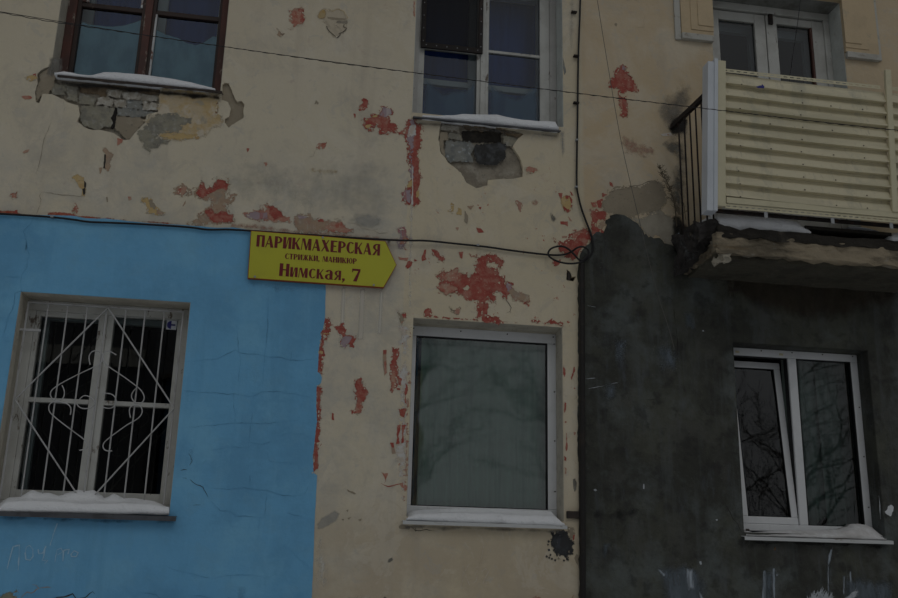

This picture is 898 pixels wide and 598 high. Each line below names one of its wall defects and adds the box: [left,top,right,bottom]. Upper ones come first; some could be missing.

peeling [276,7,307,37]
spalling [22,68,160,173]
spalling [222,84,244,127]
peeling [608,64,639,118]
peeling [353,98,424,208]
spalling [438,123,539,188]
peeling [173,176,354,236]
peeling [397,226,530,325]
spalling [711,253,732,267]
peeling [318,317,357,375]
peeling [351,377,369,416]
peeling [312,385,334,474]